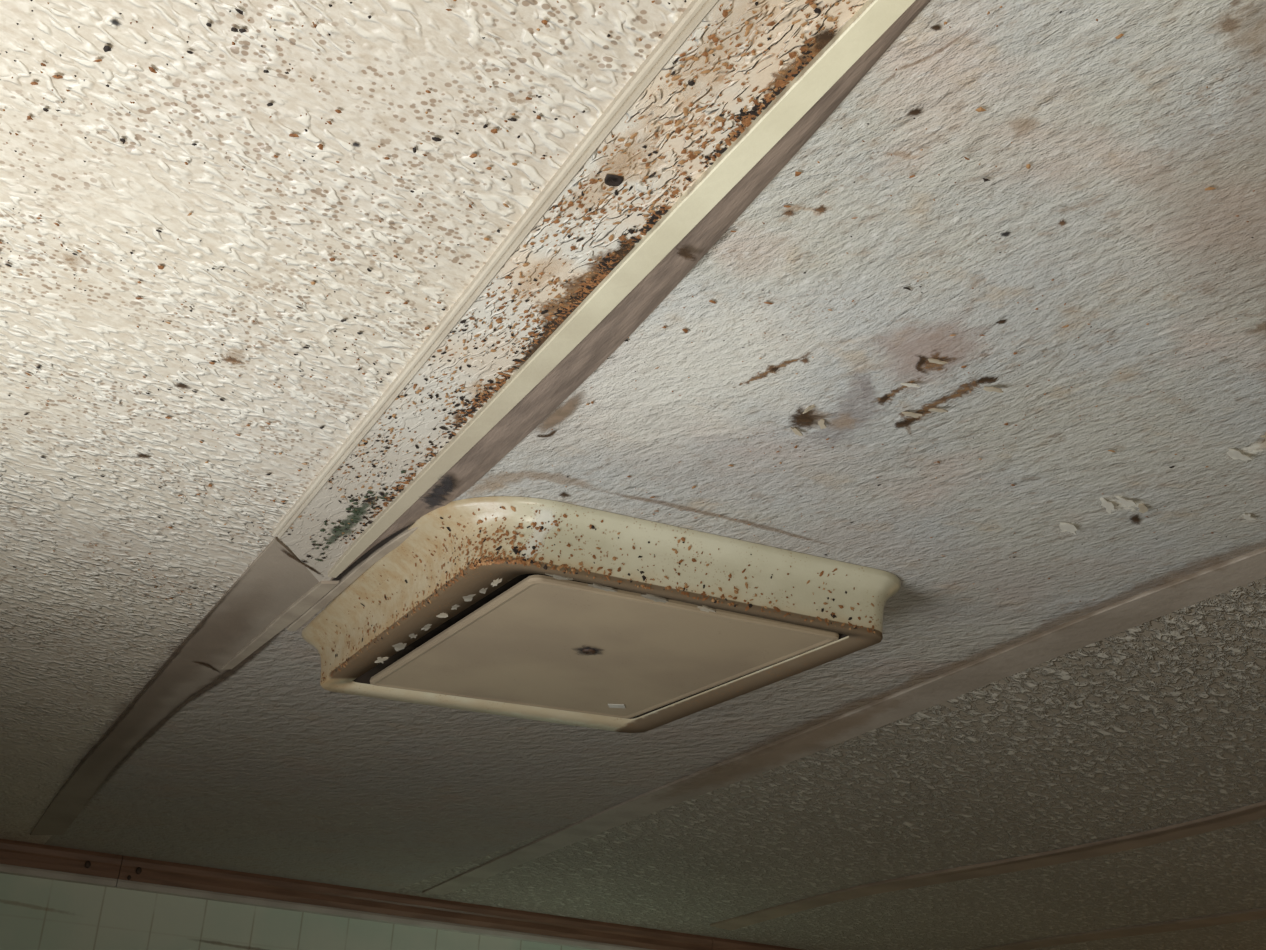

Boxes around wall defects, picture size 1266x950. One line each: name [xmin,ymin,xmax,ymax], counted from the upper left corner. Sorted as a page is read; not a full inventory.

rust [287,0,857,544]
spalling [877,353,955,403]
spalling [1226,433,1266,461]
rust [321,506,875,683]